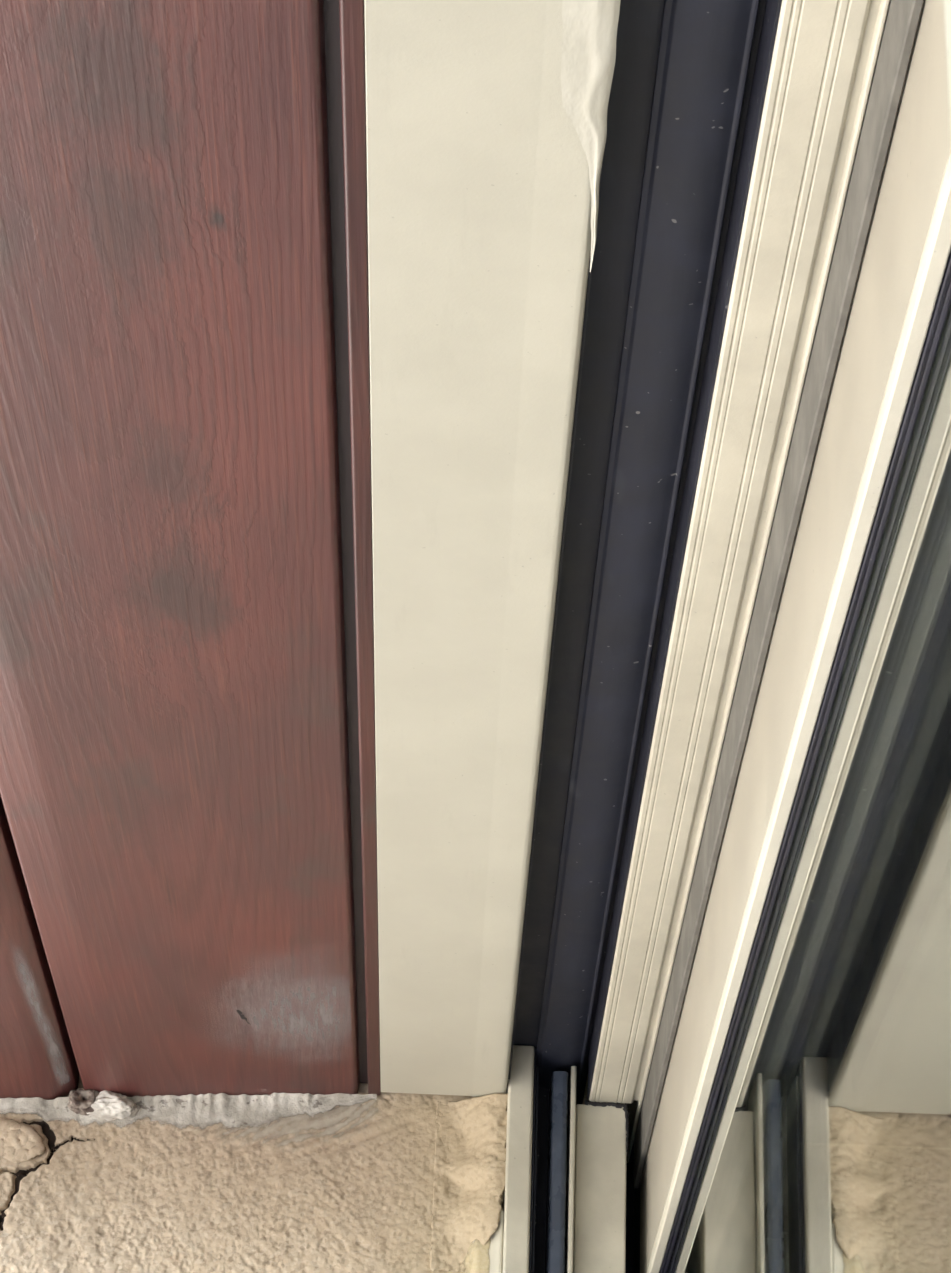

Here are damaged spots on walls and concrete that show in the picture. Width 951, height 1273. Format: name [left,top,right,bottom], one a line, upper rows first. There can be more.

crack [0,1117,95,1231]